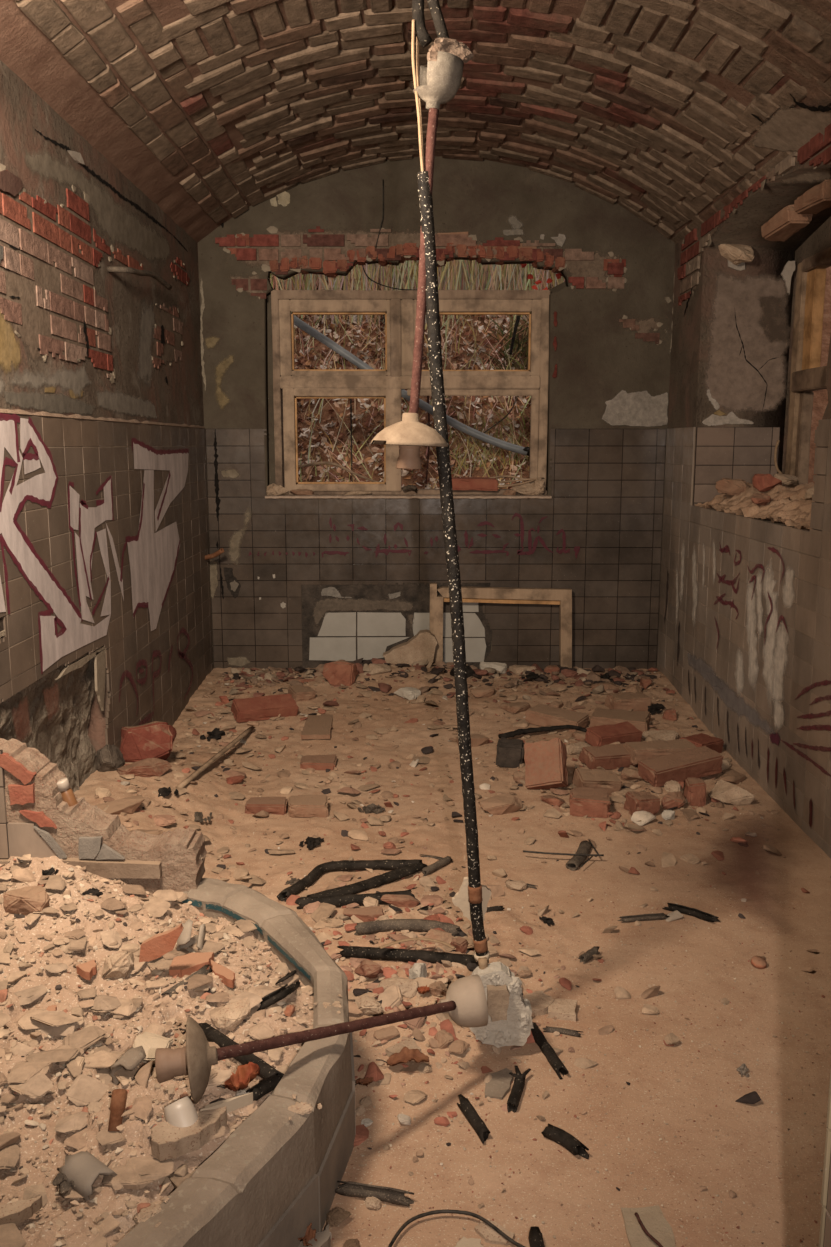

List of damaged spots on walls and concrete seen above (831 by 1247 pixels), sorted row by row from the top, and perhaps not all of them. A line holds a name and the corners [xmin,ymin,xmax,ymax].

flaking render [0,185,143,384]
peeling [67,150,85,165]
crack [35,129,188,252]
flaking render [151,303,183,369]
flaking render [215,226,420,299]
flaking render [435,232,627,291]
peeling [702,389,754,426]
flaking render [677,124,831,307]
crack [734,307,779,411]
flaking render [0,646,125,879]